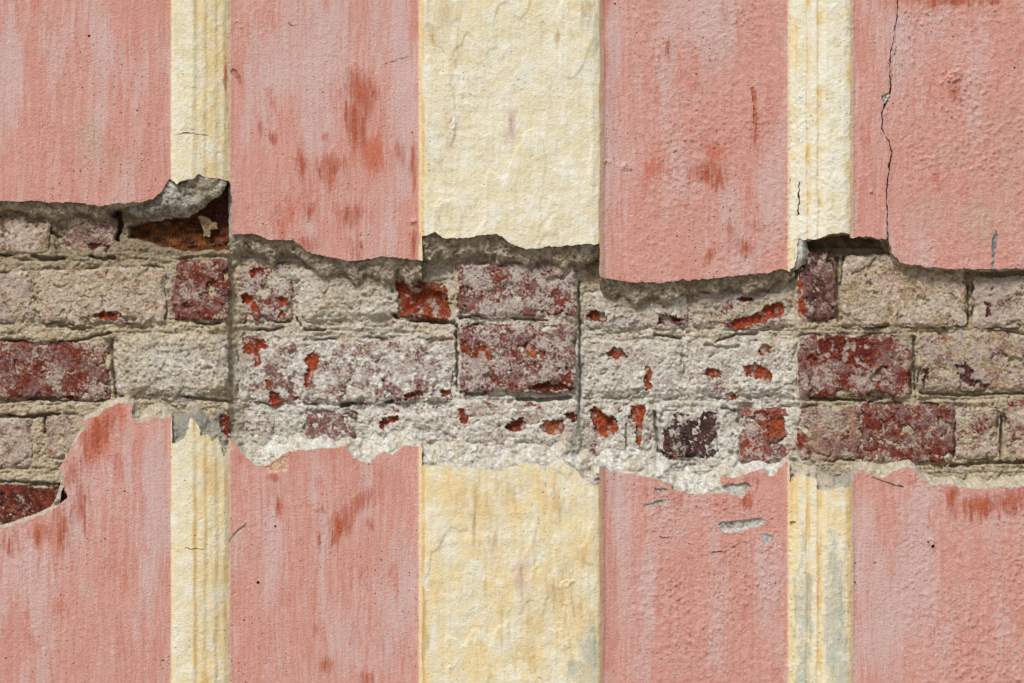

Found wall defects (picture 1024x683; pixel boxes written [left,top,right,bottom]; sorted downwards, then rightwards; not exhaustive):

crack [880,0,901,241]
spalling [0,174,1024,528]